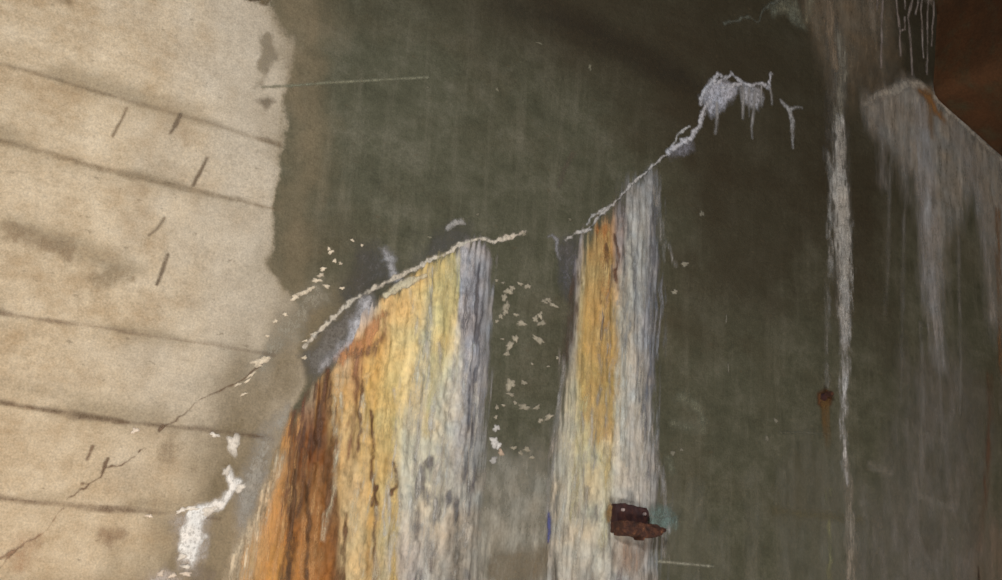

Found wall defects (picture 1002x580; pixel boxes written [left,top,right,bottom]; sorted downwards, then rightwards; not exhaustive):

water stain [704,72,799,143]
water stain [724,0,1002,350]
peeling [235,247,345,396]
water stain [839,366,849,423]
crack [71,450,141,497]
crack [0,535,40,559]
water stain [846,502,855,580]